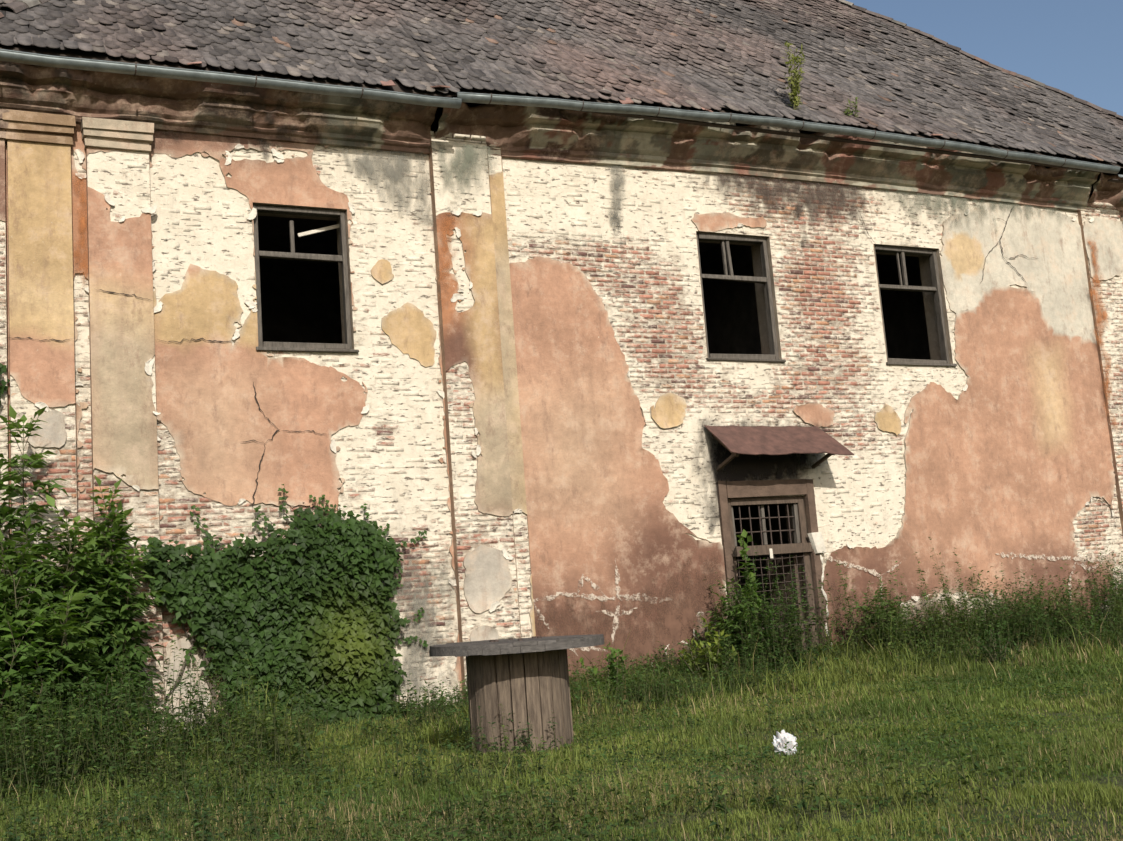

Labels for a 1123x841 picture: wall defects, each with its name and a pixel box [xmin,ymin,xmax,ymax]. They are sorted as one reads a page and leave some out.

leakage [345,151,431,221]
leakage [441,144,491,183]
leakage [612,165,624,223]
leakage [718,173,865,220]
crack [981,209,1037,282]
spalling [1034,195,1123,229]
crack [244,382,329,511]
spalling [0,131,1004,738]
spalling [1072,264,1123,621]
leakage [538,562,727,684]